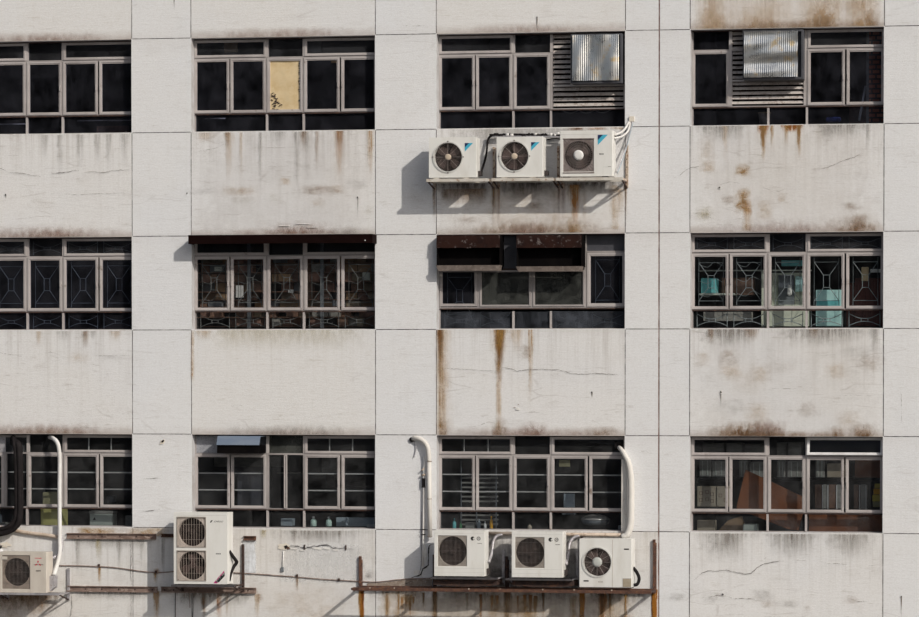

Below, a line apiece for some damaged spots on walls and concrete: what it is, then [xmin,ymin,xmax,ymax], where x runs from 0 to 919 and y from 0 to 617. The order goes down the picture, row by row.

rust [759,125,802,149]
rust [558,185,579,210]
rust [496,330,504,367]
leakage [720,425,801,436]
rust [385,592,437,617]
rust [479,592,544,617]
rust [572,593,585,617]